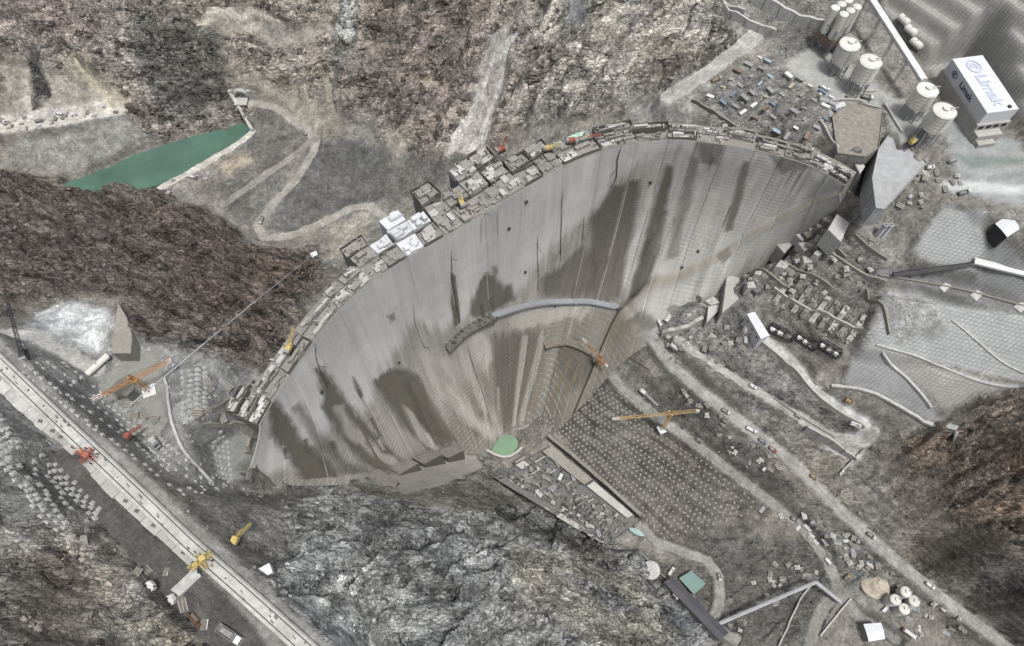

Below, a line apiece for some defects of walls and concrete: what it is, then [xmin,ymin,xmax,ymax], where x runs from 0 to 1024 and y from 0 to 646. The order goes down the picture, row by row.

crack [537,189,585,292]
leakage [544,166,672,306]
leakage [726,171,746,231]
leakage [451,274,513,325]
leakage [316,369,401,472]
leakage [374,369,455,450]